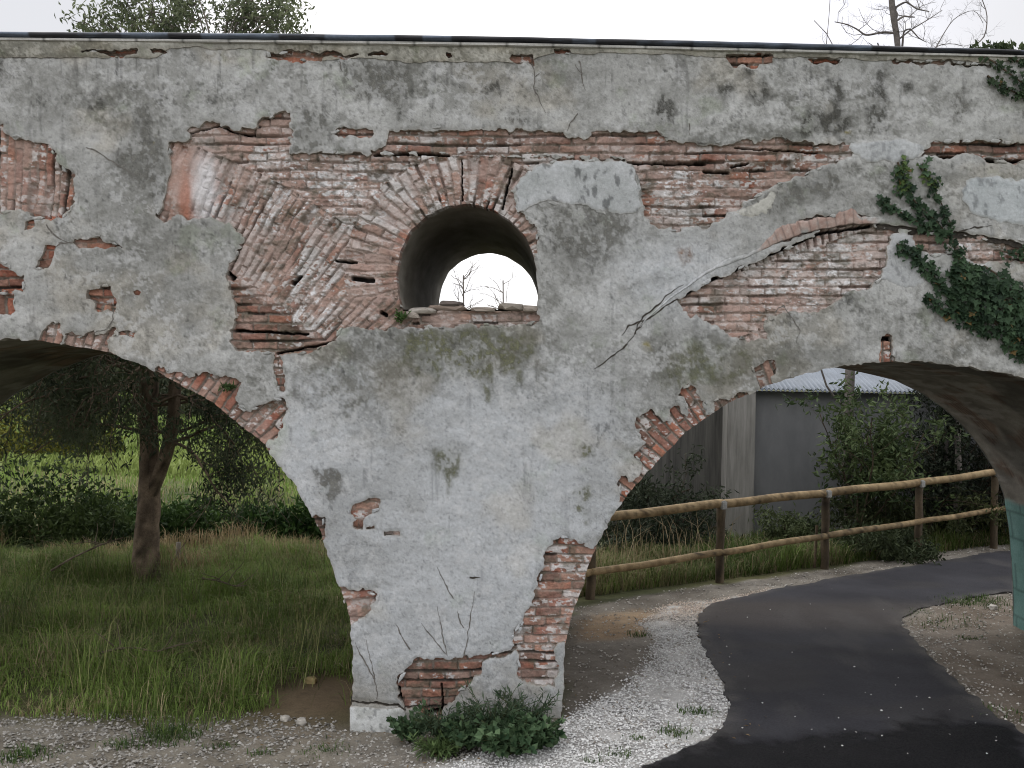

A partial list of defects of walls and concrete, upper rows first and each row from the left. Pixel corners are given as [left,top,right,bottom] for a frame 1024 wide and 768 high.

flaking render [266,51,357,64]
flaking render [0,125,75,230]
flaking render [918,139,1024,165]
flaking render [0,261,25,315]
flaking render [38,321,135,355]
flaking render [156,112,852,451]
crack [595,285,683,369]
flaking render [677,214,1024,342]
flaking render [617,384,747,502]
flaking render [347,498,400,535]
flaking render [340,586,379,624]
flaking render [397,535,596,728]